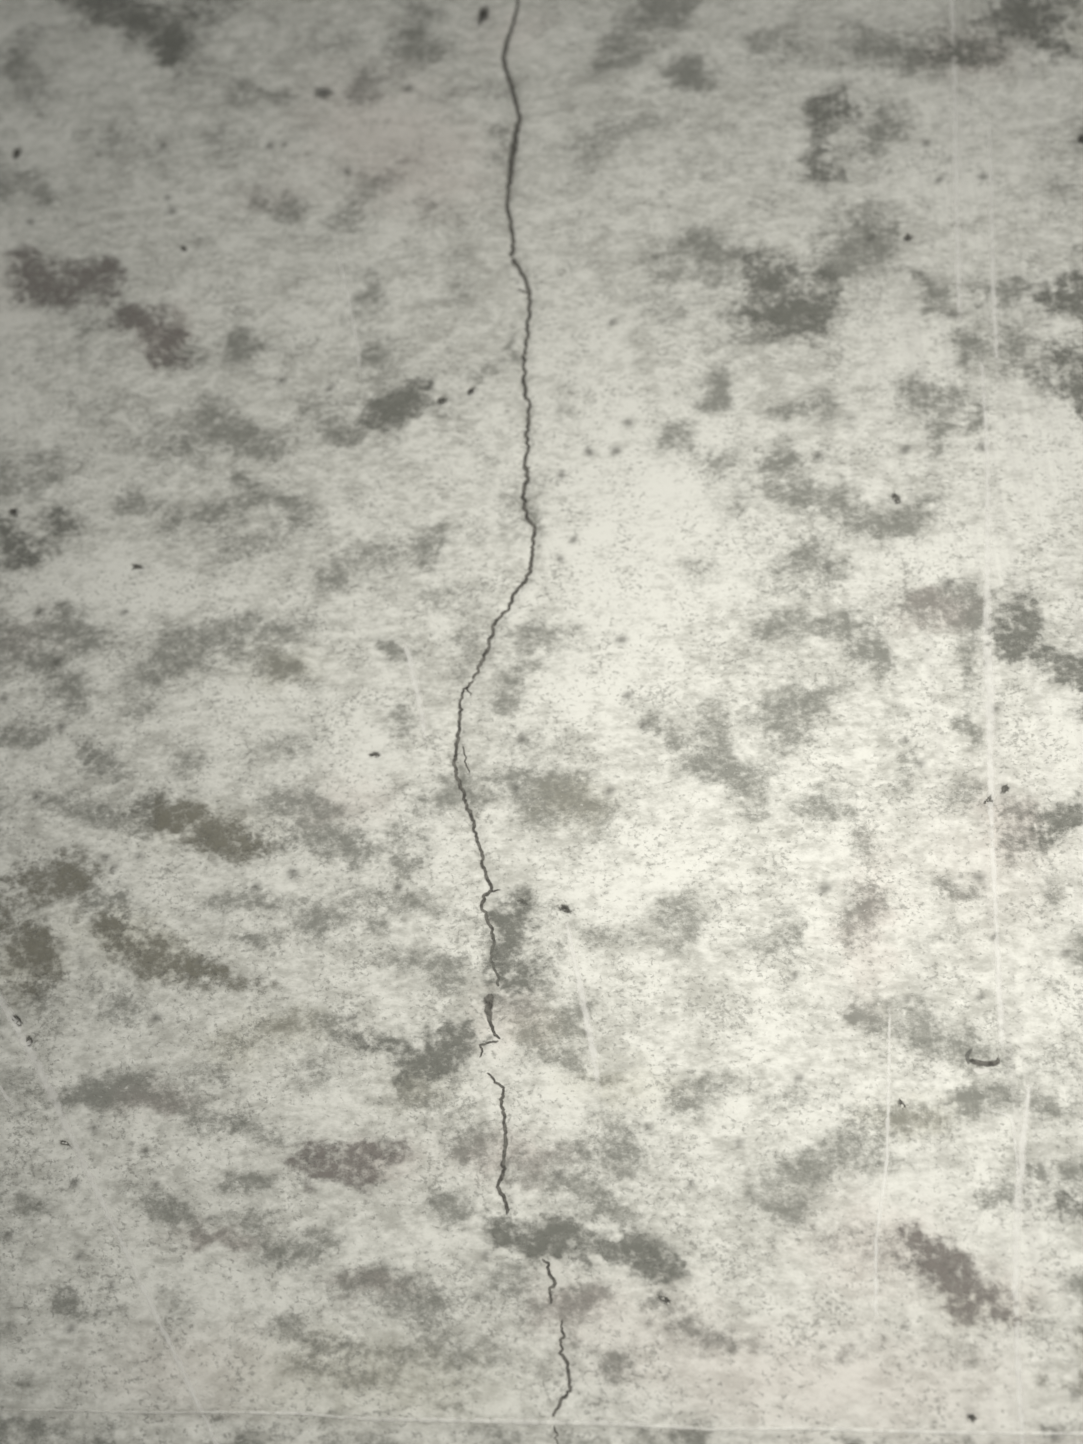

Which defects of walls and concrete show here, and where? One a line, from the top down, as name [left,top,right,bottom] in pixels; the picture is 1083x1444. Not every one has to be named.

crack [452,0,537,1214]
crack [542,1259,572,1444]